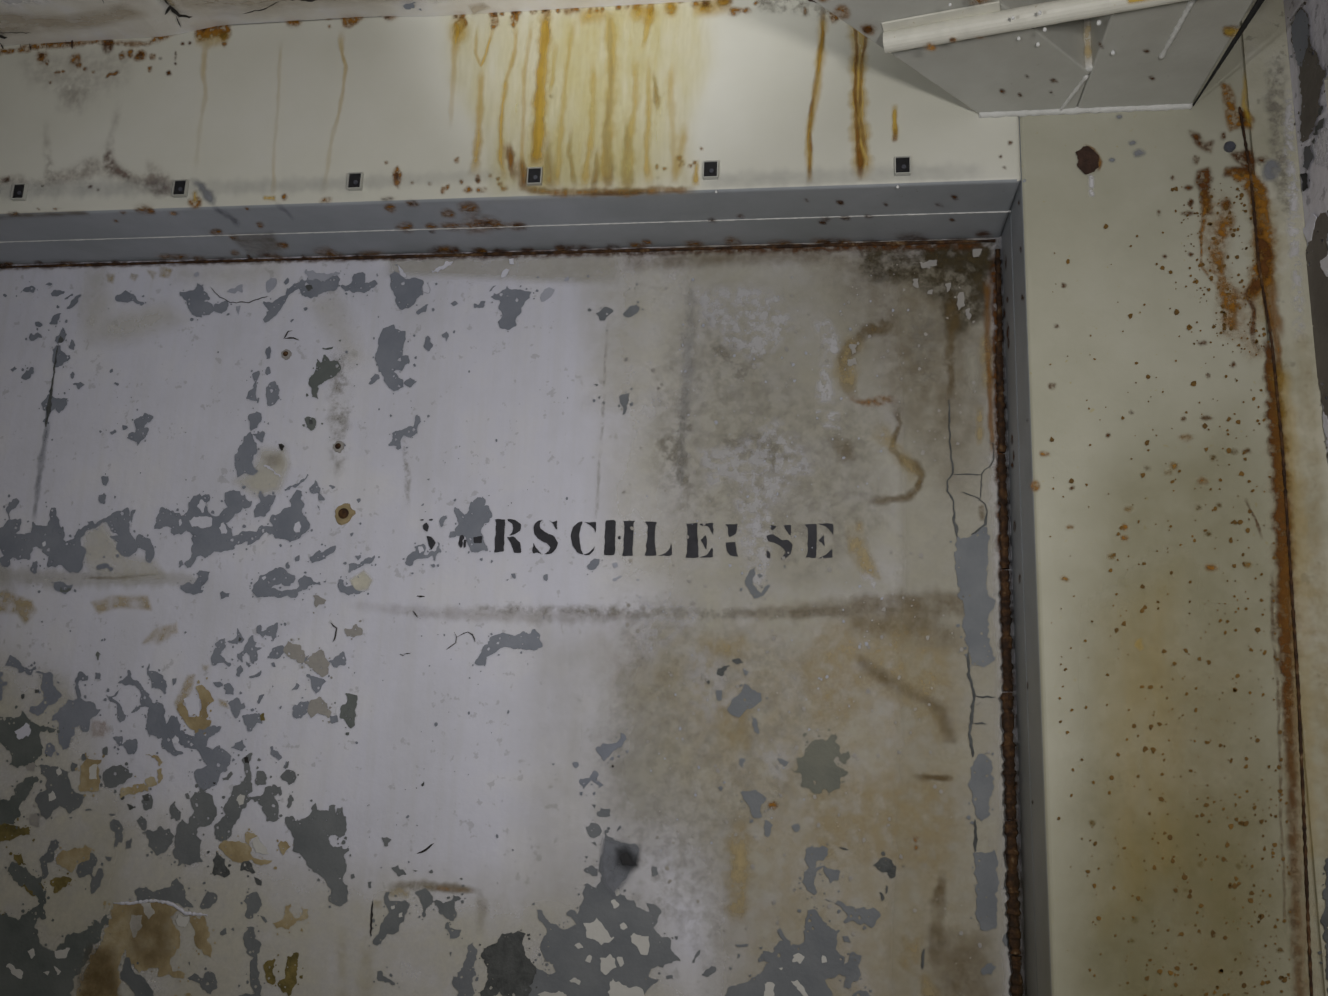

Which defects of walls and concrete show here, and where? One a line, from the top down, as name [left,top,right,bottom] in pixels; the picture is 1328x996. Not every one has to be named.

crack [165,0,192,27]
rust [427,0,872,229]
spalling [1287,2,1328,191]
peeling [0,340,376,614]
damp [0,676,555,996]
peeling [0,620,904,996]
rust [0,230,1033,996]
damp [627,241,1001,996]
crack [947,402,994,537]
crack [967,652,994,757]
rust [1070,84,1296,996]
spalling [1303,210,1328,457]